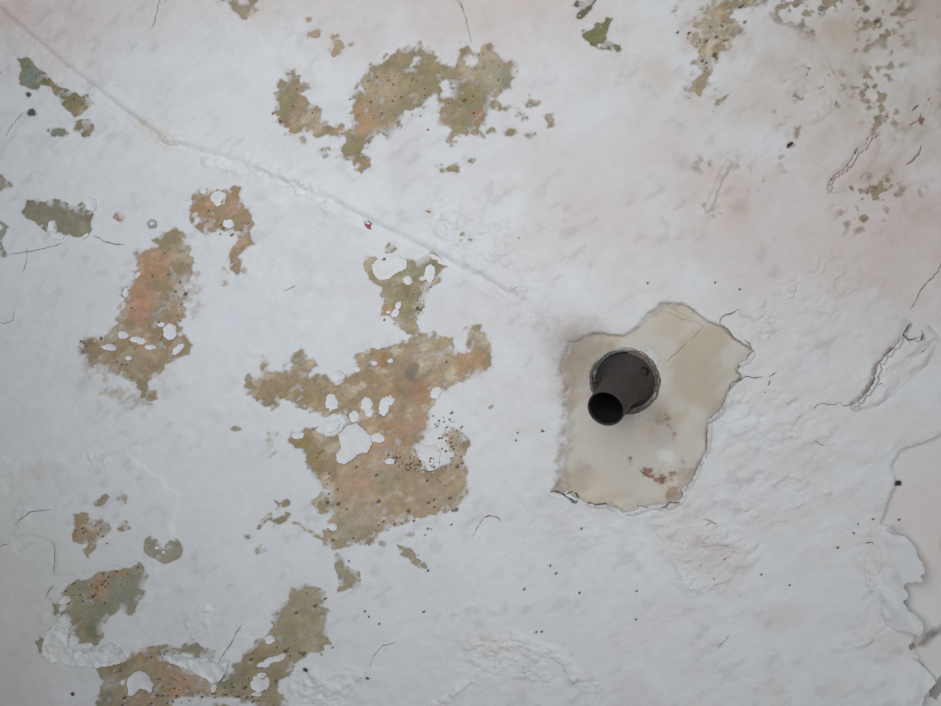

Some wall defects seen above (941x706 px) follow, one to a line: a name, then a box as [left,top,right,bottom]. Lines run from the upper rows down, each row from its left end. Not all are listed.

peeling [17,57,94,137]
peeling [272,42,530,173]
peeling [574,0,621,52]
peeling [676,0,765,96]
peeling [22,198,97,242]
peeling [187,186,254,274]
peeling [79,220,199,405]
peeling [244,243,491,592]
peeling [554,303,756,516]
peeling [72,494,130,557]
peeling [36,537,333,706]
peeling [834,435,941,706]